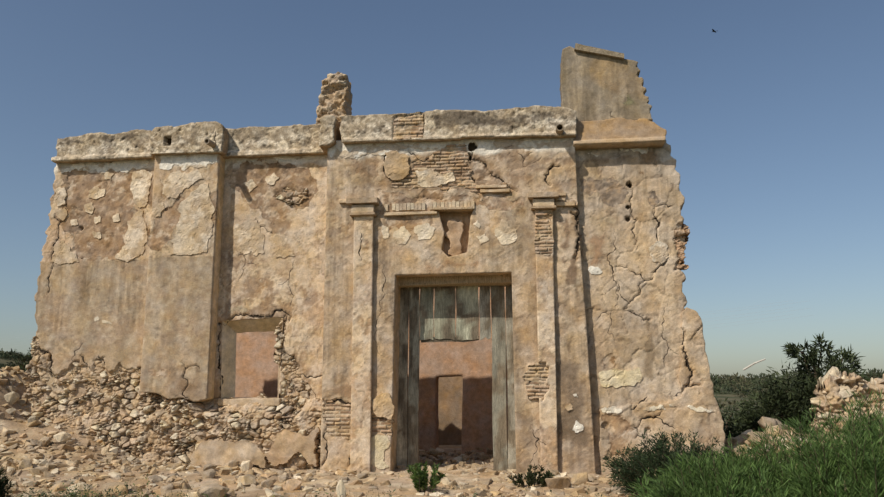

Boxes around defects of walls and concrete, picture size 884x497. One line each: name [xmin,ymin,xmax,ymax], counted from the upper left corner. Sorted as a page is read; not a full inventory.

flaking render [51,169,215,265]
flaking render [228,158,318,258]
flaking render [378,142,525,245]
crack [518,152,560,185]
flaking render [534,209,554,256]
flaking render [21,316,351,471]
crack [182,270,293,403]
flaking render [522,362,549,401]
crack [598,186,697,437]